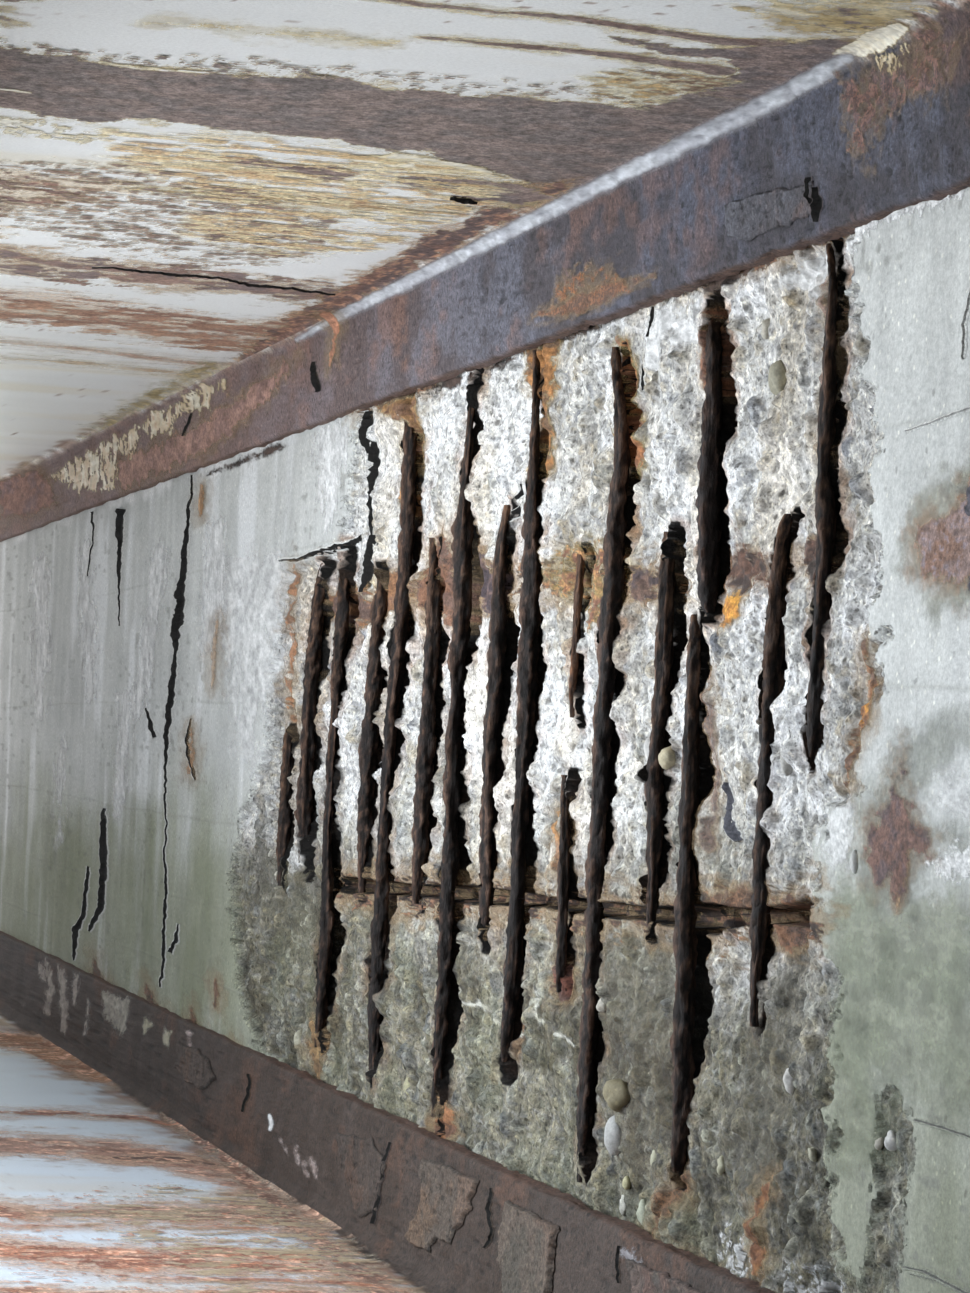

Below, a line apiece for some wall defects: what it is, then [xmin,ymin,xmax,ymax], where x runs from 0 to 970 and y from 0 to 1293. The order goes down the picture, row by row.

rust [0,37,742,106]
peeling [0,36,853,206]
spalling [803,176,824,222]
rust [0,128,572,429]
crack [86,508,128,626]
water stain [197,519,289,762]
rust [328,527,454,631]
crack [71,808,110,962]
crack [144,474,198,988]
spalling [225,234,898,1293]
water stain [818,796,852,864]
water stain [38,957,130,1035]